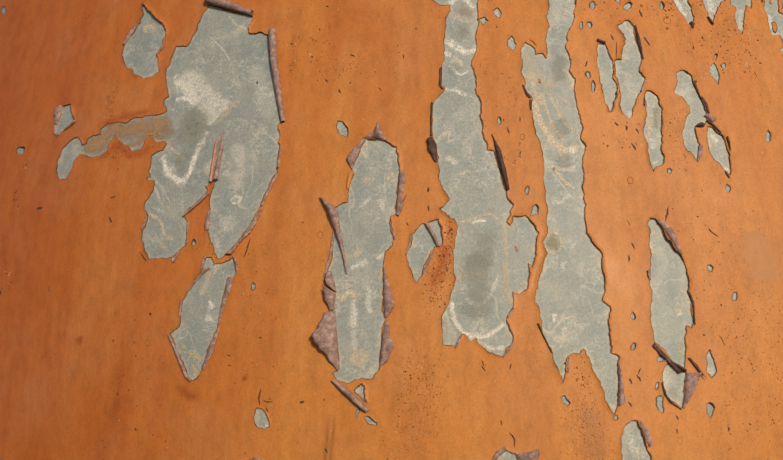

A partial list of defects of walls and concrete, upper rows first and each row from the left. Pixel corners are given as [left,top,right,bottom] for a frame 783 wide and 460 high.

peeling [53,0,285,381]
peeling [310,123,408,418]
rust [422,215,456,315]
peeling [405,0,654,460]
peeling [585,0,673,174]
peeling [659,0,695,29]
rust [596,0,764,84]
peeling [647,217,717,413]
peeling [674,70,732,193]
peeling [709,53,726,85]
peeling [702,0,752,34]
peeling [762,0,783,52]